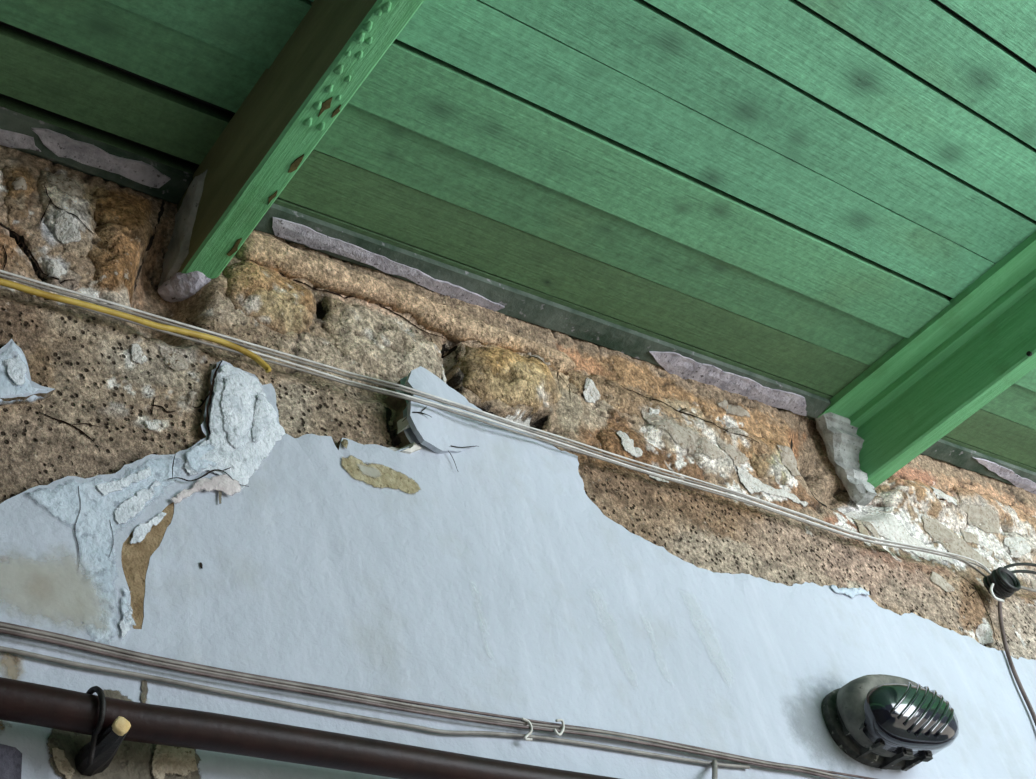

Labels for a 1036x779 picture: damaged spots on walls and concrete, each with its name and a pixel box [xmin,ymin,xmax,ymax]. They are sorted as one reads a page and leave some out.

peeling [318,97,341,118]
crack [3,186,96,284]
spalling [0,128,1036,660]
peeling [103,689,132,701]
peeling [47,729,201,779]